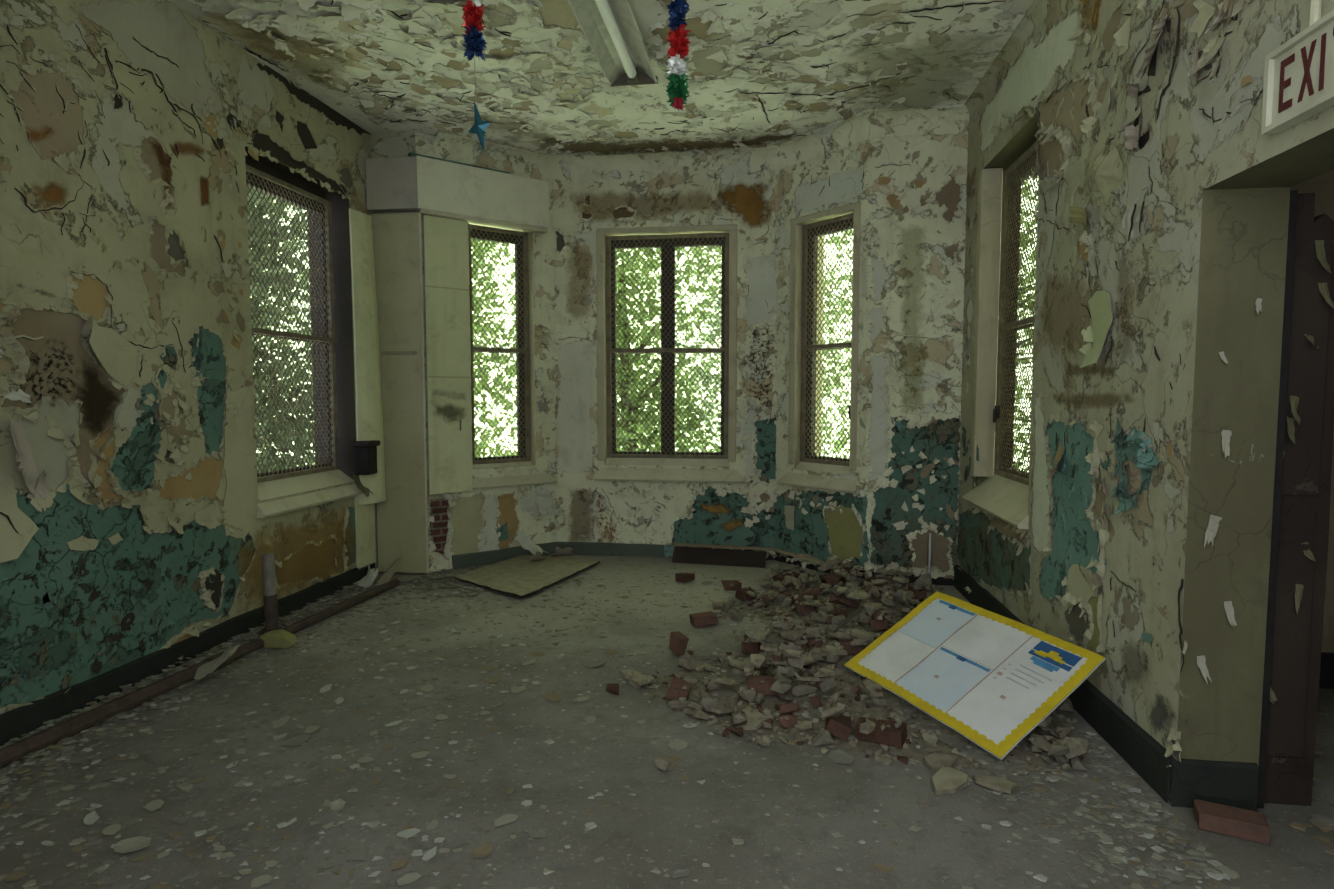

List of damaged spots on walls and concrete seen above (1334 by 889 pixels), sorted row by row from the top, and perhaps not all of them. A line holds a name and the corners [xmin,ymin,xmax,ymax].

crack [0,23,147,235]
crack [0,270,209,444]
peeling [0,174,256,711]
peeling [133,135,192,280]
crack [166,104,249,193]
crack [214,235,224,262]
crack [196,17,285,71]
peeling [427,490,522,557]
peeling [114,0,913,201]
peeling [793,0,1253,272]
peeling [1079,291,1113,368]
crack [1031,0,1263,363]